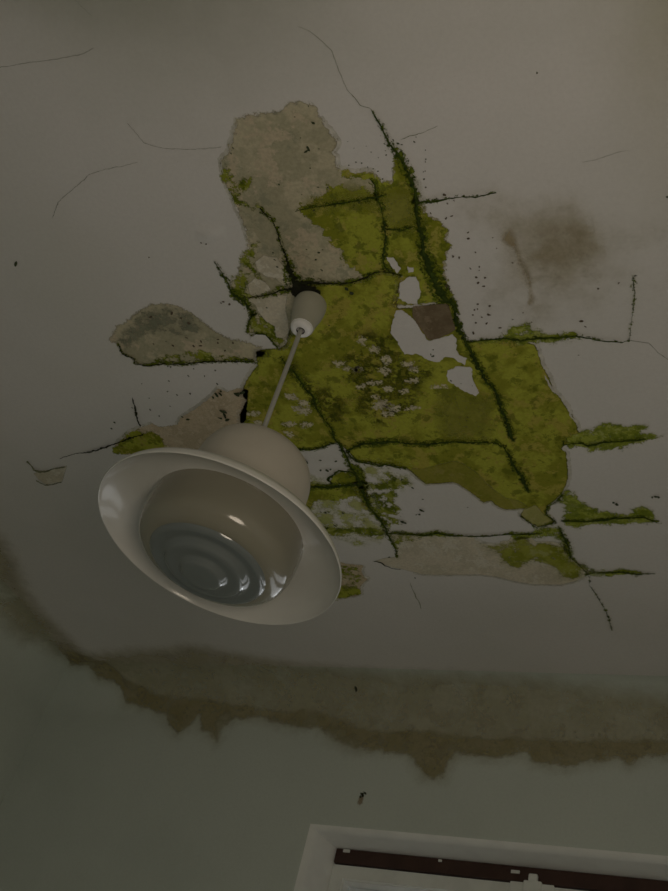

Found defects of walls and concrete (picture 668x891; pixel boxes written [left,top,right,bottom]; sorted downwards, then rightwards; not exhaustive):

crack [117,343,257,367]
flaking render [109,101,590,601]
crack [214,27,531,558]
crack [60,397,144,459]
crack [520,493,612,631]